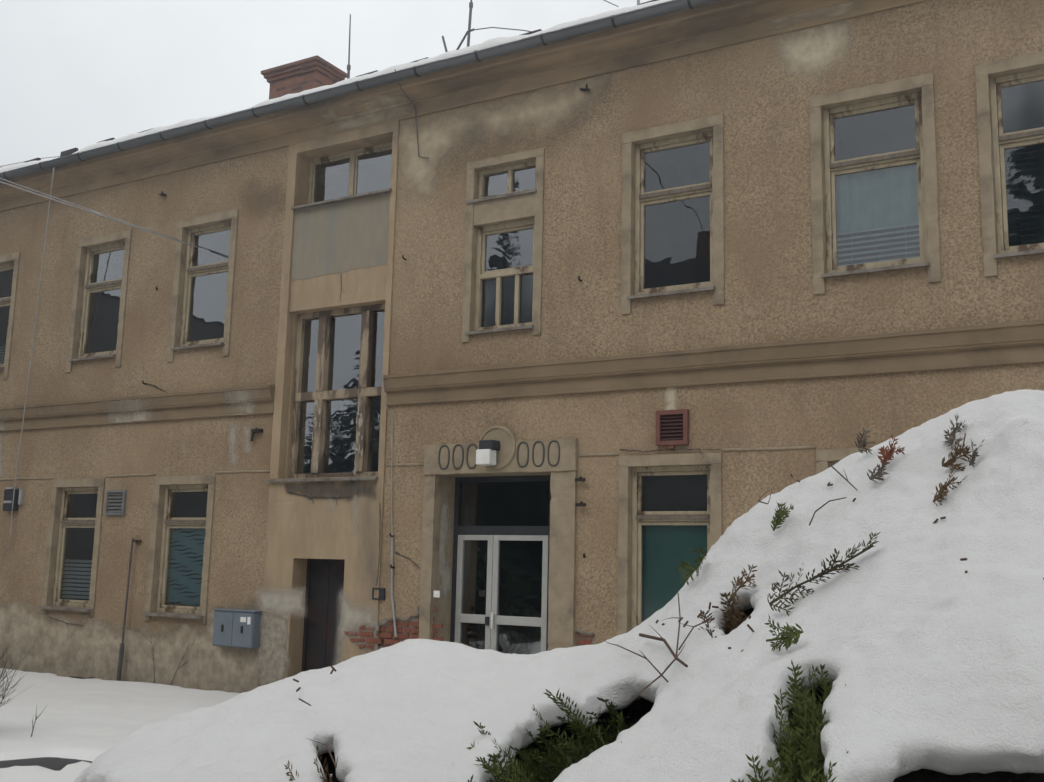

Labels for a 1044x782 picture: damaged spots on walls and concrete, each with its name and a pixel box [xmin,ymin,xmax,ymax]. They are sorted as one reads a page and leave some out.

flaking render [343,606,420,650]
peeling [432,497,451,641]